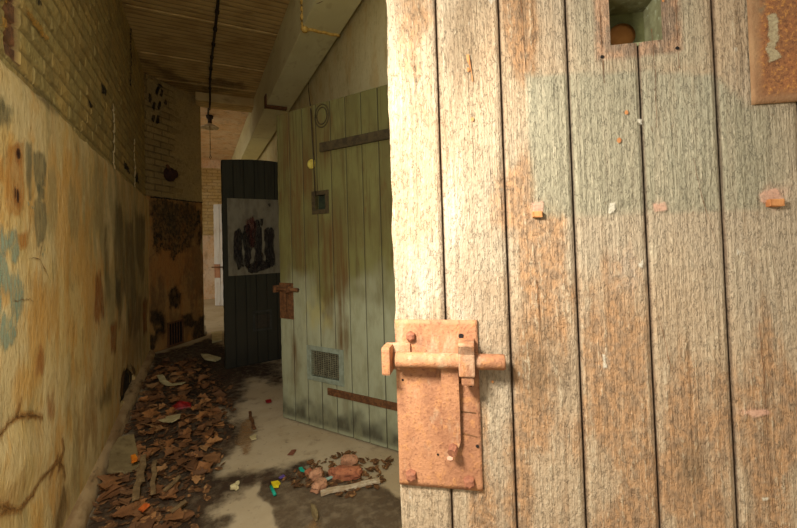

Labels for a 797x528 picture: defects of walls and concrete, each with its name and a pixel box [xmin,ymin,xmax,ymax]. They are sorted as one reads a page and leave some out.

peeling [0,231,24,350]
crack [0,400,43,436]
crack [0,438,66,516]
water stain [258,471,402,528]